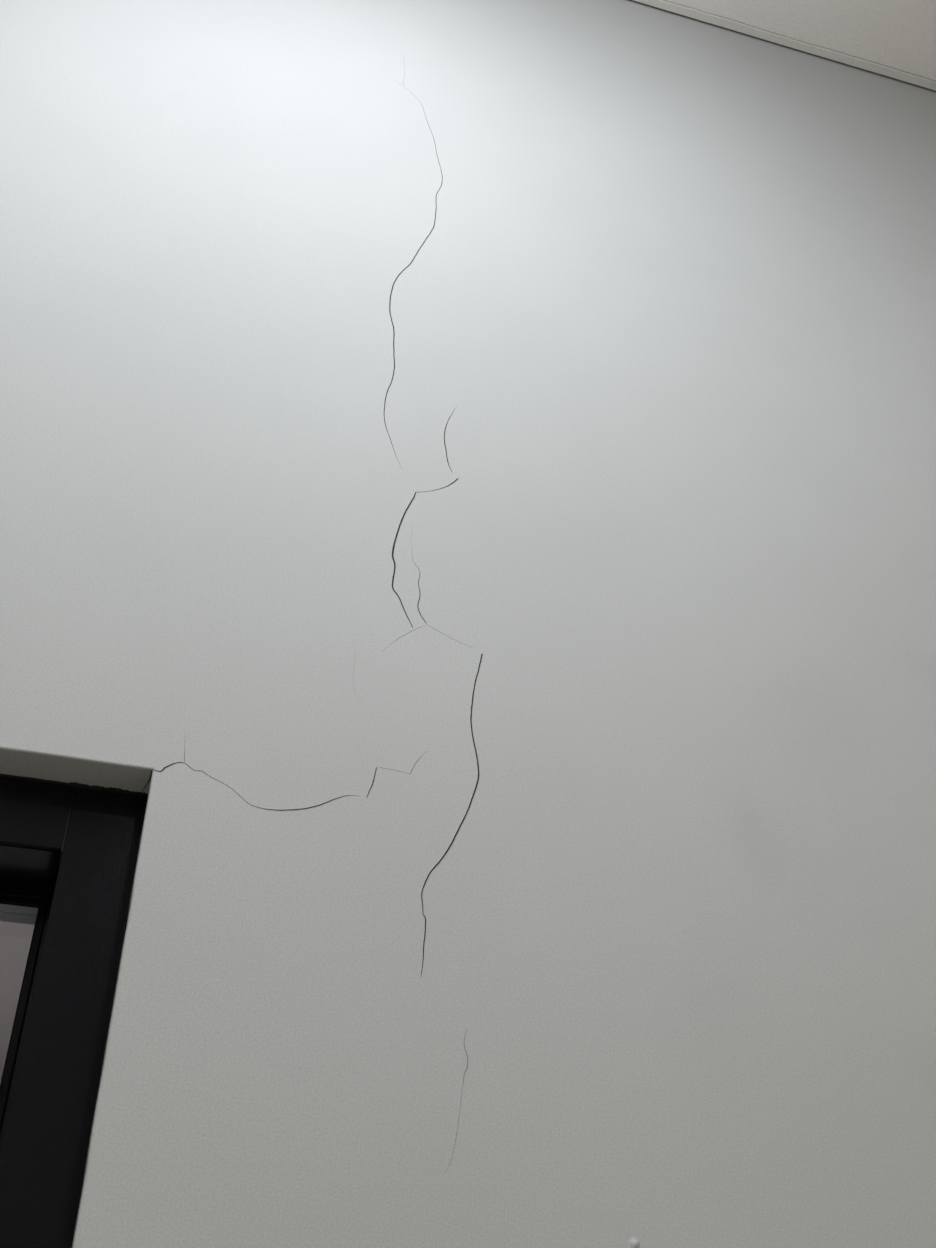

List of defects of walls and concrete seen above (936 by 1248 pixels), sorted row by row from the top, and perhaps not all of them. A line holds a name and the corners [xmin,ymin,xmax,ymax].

crack [133,735,427,812]
crack [352,54,483,977]